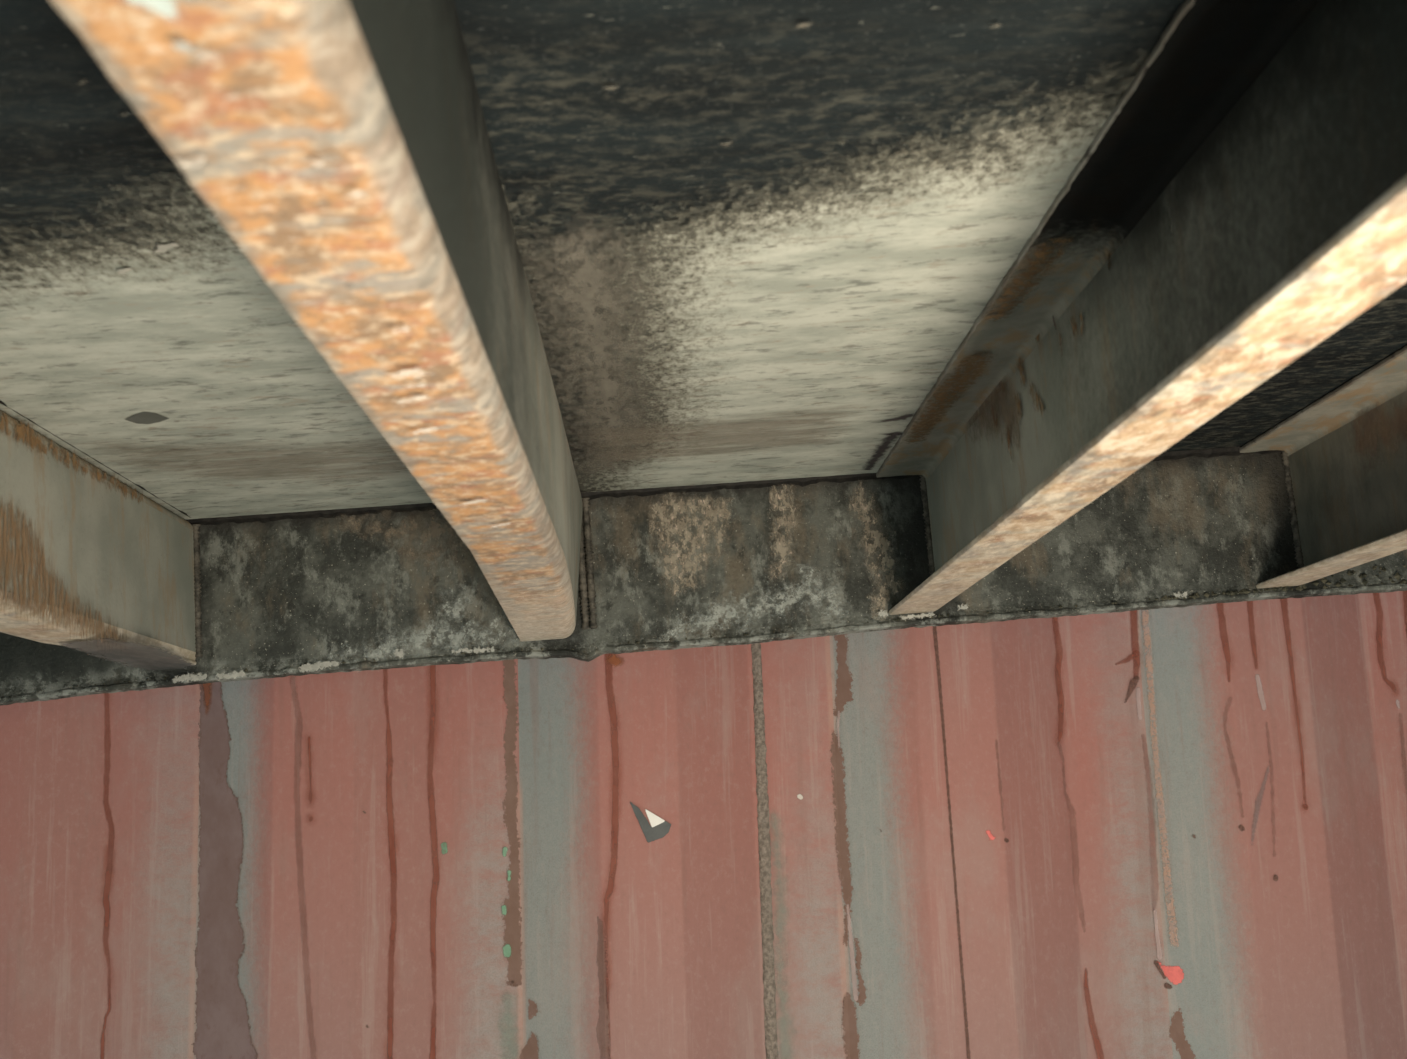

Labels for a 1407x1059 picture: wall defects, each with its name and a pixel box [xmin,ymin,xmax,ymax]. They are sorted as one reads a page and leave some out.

leakage [125,412,169,424]
peeling [172,670,257,1059]
peeling [299,661,339,674]
corrosion [384,669,397,1059]
corrosion [428,665,440,1059]
corrosion [604,653,622,1059]
leakage [650,494,730,594]
leakage [667,485,842,641]
peeling [830,634,867,1059]
leakage [849,414,913,617]
corrosion [1116,610,1179,960]
peeling [1169,1008,1196,1059]